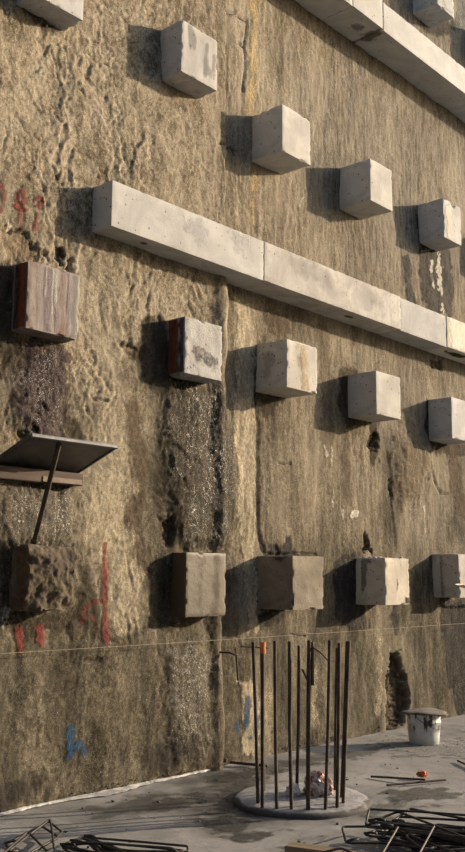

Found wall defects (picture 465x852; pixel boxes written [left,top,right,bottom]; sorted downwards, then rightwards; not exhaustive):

rust [17,262,27,328]
leakage [0,259,86,439]
rust [168,319,179,374]
leakage [131,296,284,634]
leakage [0,372,149,637]
leakage [270,536,295,561]
spalling [385,655,405,726]